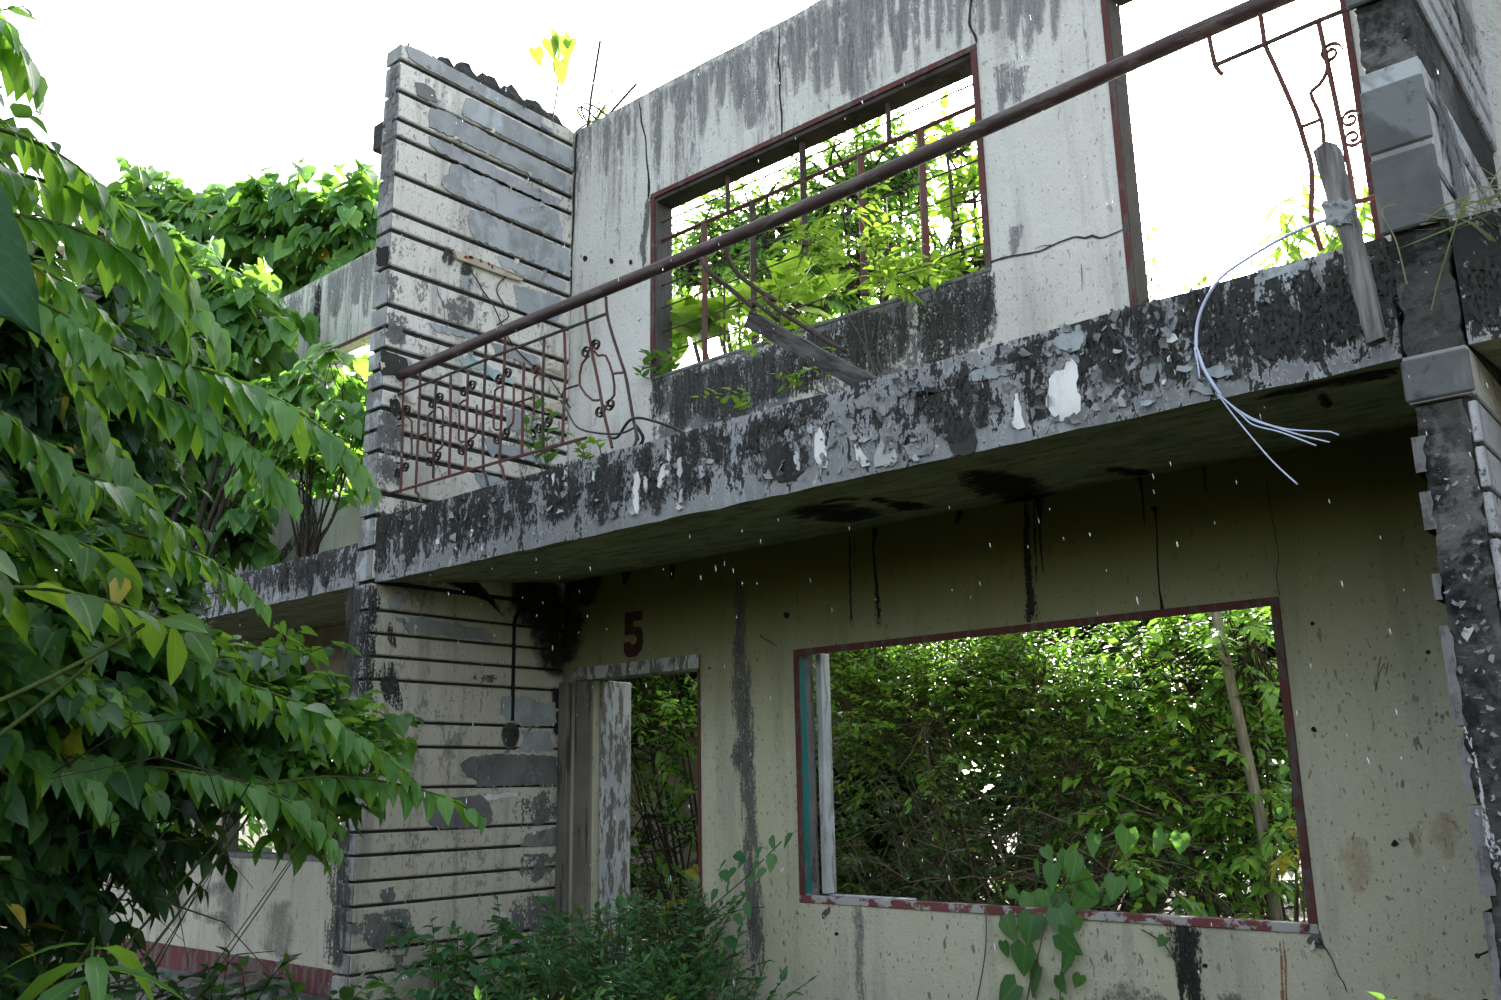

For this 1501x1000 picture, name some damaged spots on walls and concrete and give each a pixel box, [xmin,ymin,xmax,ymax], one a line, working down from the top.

damp [378,65,399,197]
damp [653,0,1060,164]
peeling [429,322,542,384]
damp [801,271,998,462]
peeling [763,299,1237,483]
crack [991,229,1123,278]
peeling [1251,261,1307,304]
peeling [396,409,715,563]
damp [341,343,848,711]
damp [448,576,601,735]
spalling [1416,399,1501,968]
damp [730,577,765,978]